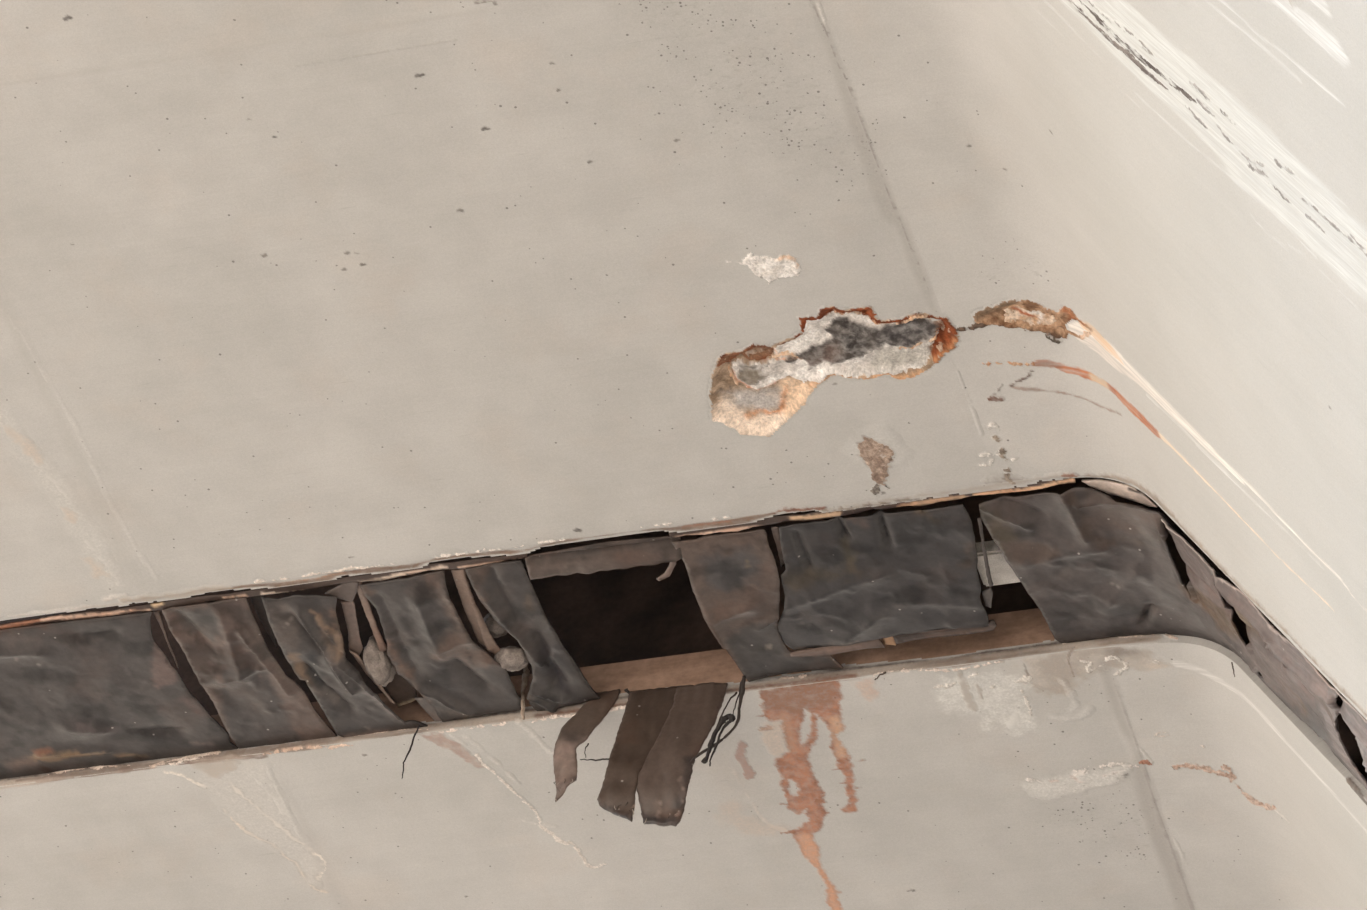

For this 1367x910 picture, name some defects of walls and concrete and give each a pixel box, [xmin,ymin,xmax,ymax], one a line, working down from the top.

crack [1068,0,1367,257]
peeling [724,249,802,285]
spalling [707,297,1093,438]
spalling [837,422,917,497]
corrosion [980,358,1340,618]
corrosion [213,470,1367,718]
peeling [530,713,576,724]
peeling [15,742,369,783]
corrosion [733,677,888,910]
peeling [1012,758,1154,802]
peeling [1171,762,1292,825]
peeling [1345,775,1367,805]